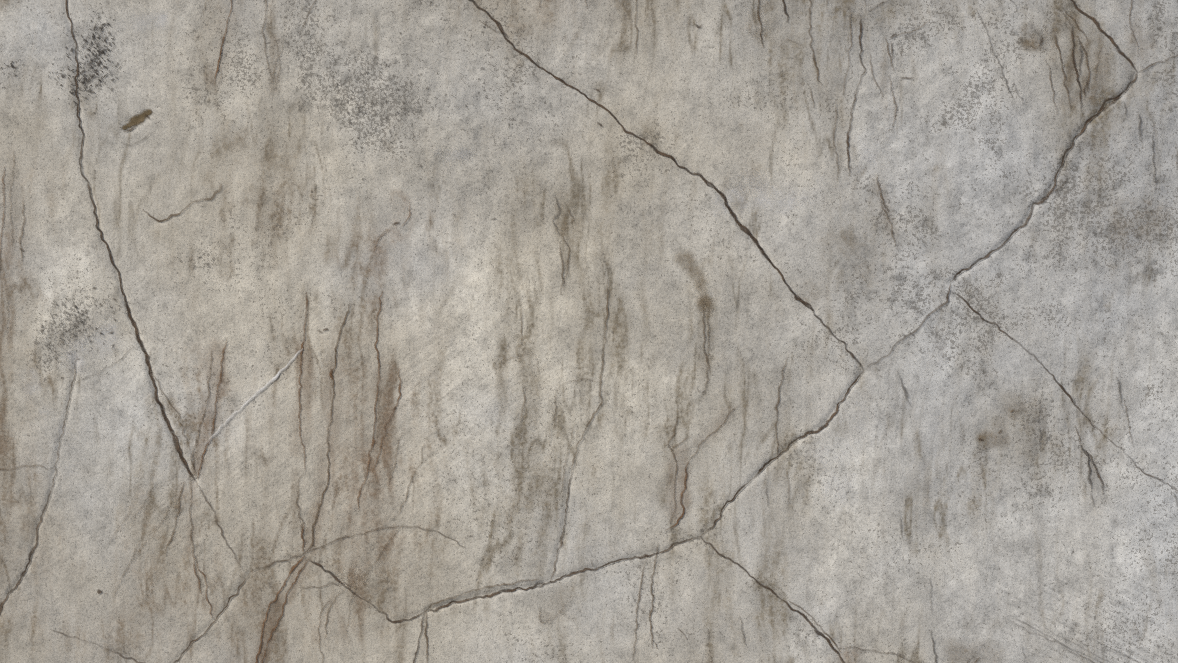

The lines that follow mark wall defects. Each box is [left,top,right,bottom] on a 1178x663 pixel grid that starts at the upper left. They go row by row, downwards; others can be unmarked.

damp [49,3,124,113]
crack [833,21,866,168]
crack [65,0,193,476]
crack [892,0,1176,348]
crack [386,0,860,663]
crack [1045,368,1079,409]
crack [0,476,55,612]
crack [174,580,245,663]
crack [271,536,360,598]